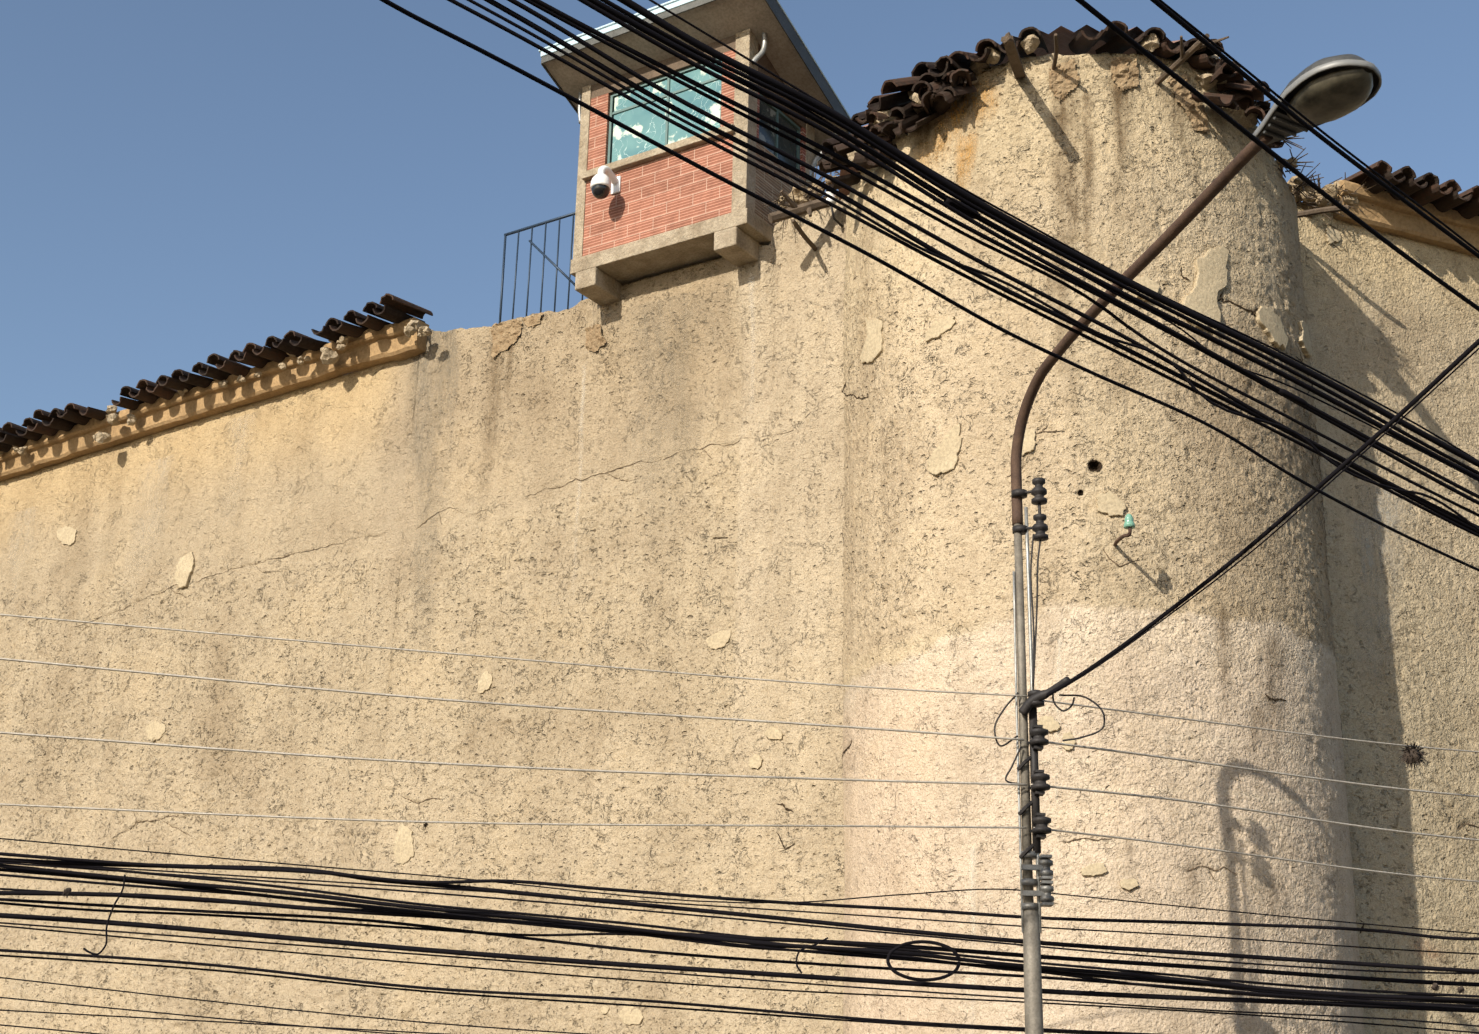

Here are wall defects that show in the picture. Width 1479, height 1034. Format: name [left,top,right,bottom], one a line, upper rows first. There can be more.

flaking render [1133,275,1160,302]
flaking render [1181,246,1229,331]
flaking render [1255,306,1313,358]
crack [528,430,793,496]
flaking render [174,551,195,589]